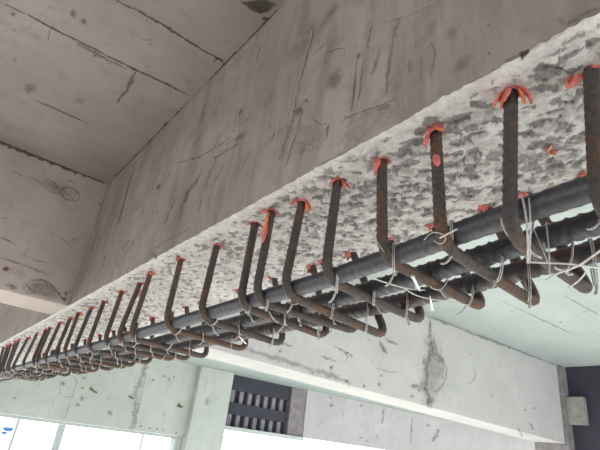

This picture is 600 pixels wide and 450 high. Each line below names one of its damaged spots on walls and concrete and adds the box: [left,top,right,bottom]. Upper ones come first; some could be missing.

peeling [492,87,533,109]
peeling [565,73,583,89]
peeling [423,126,444,148]
peeling [246,209,280,243]
spalling [518,175,600,268]
spalling [448,205,551,283]
spalling [0,230,497,383]